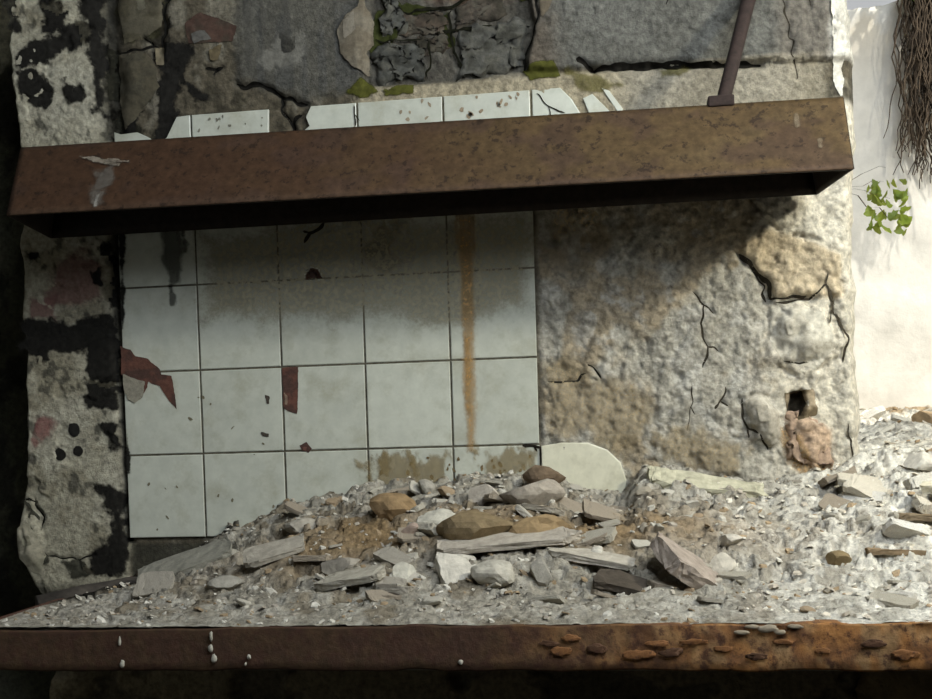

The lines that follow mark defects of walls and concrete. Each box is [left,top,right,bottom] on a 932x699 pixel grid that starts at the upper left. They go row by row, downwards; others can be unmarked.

spalling [337,0,530,86]
crack [522,0,540,71]
crack [576,56,761,73]
crack [537,93,565,115]
water stain [162,231,187,305]
corrosion [459,214,474,450]
crack [693,292,719,368]
spalling [120,346,177,409]
spalling [282,367,298,414]
spalling [784,388,834,467]
corrosion [622,640,669,660]